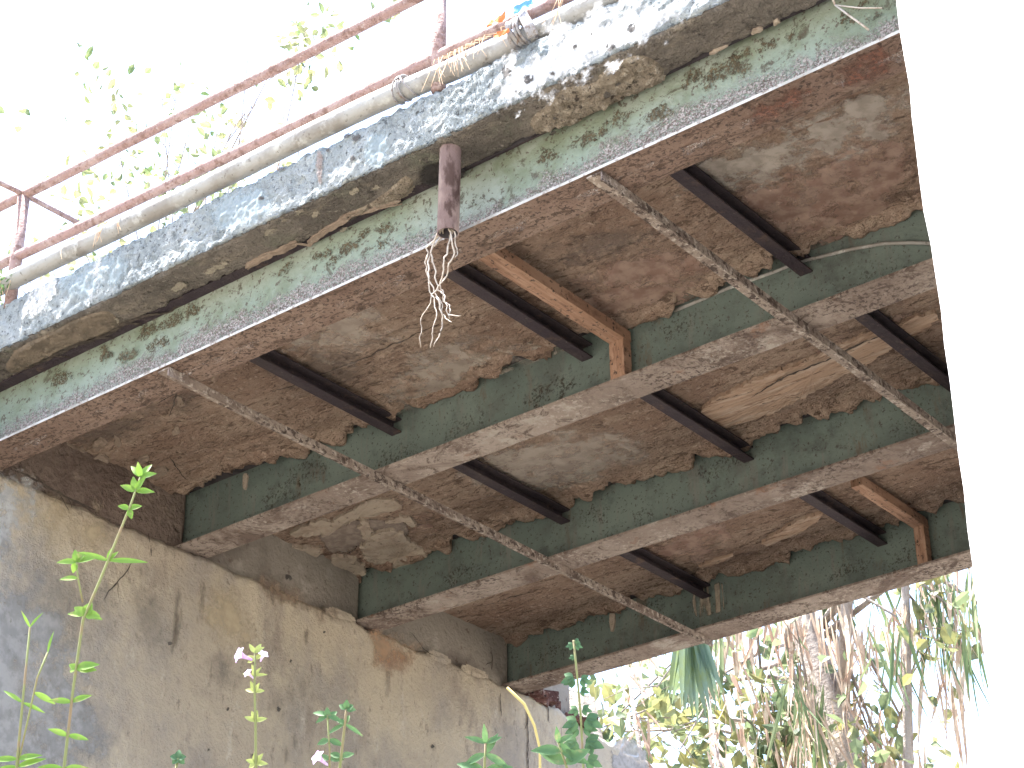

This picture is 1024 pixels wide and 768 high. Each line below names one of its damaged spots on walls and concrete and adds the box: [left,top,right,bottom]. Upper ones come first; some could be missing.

spalling [530,55,666,135]
corrosion [459,1,904,230]
corrosion [741,140,908,245]
leakage [22,247,126,318]
corrosion [0,222,439,438]
spalling [289,497,428,576]